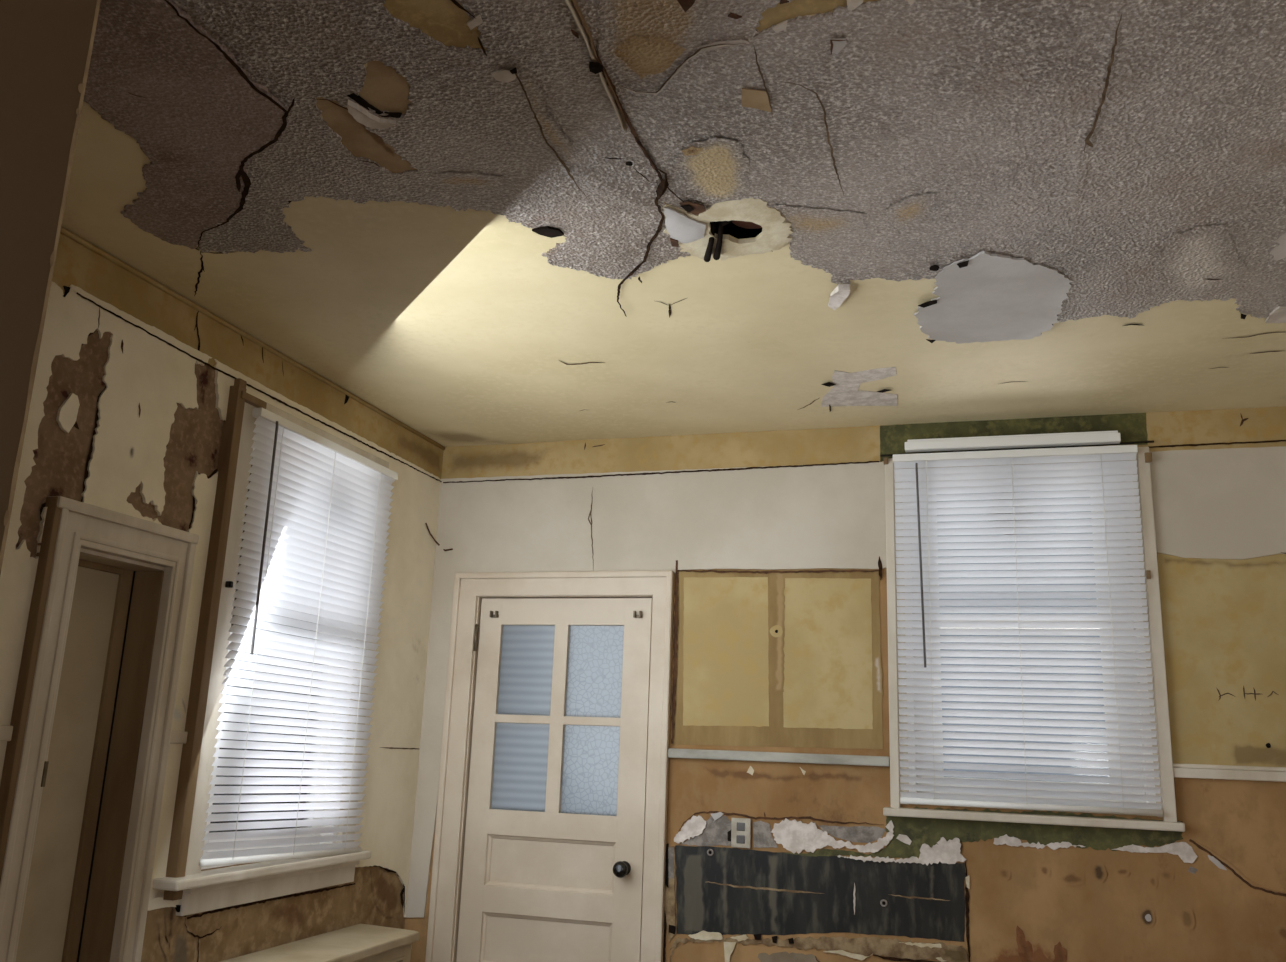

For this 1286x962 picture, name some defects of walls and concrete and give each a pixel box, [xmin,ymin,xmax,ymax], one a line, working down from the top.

peeling [0,0,101,575]
crack [165,0,348,351]
peeling [383,0,487,50]
crack [501,68,590,202]
flaking render [664,207,706,247]
crack [571,29,844,318]
peeling [756,0,878,33]
peeling [828,284,850,310]
crack [1084,14,1122,153]
flaking render [665,812,969,962]
leakage [939,944,968,962]
crack [1189,838,1286,897]